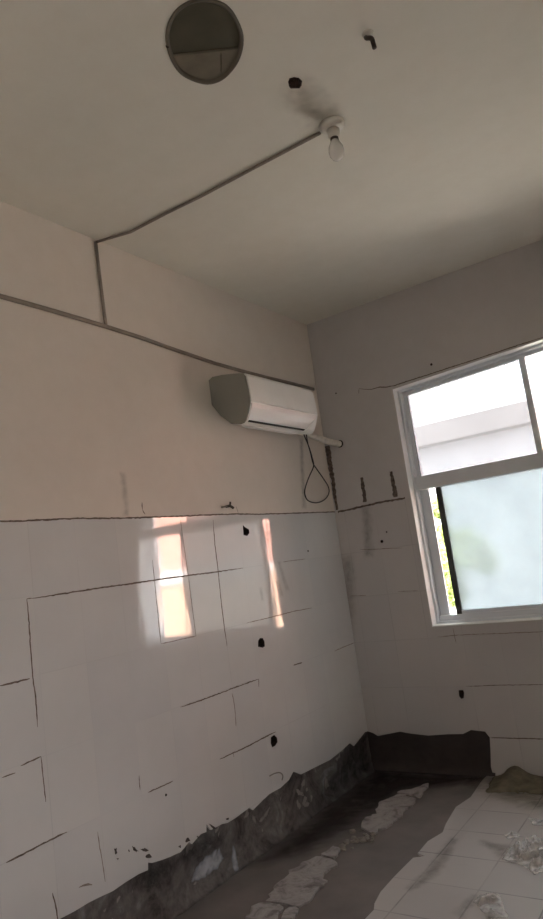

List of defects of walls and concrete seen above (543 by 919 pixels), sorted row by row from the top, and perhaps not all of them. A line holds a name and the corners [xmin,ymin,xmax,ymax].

spalling [61,730,495,919]